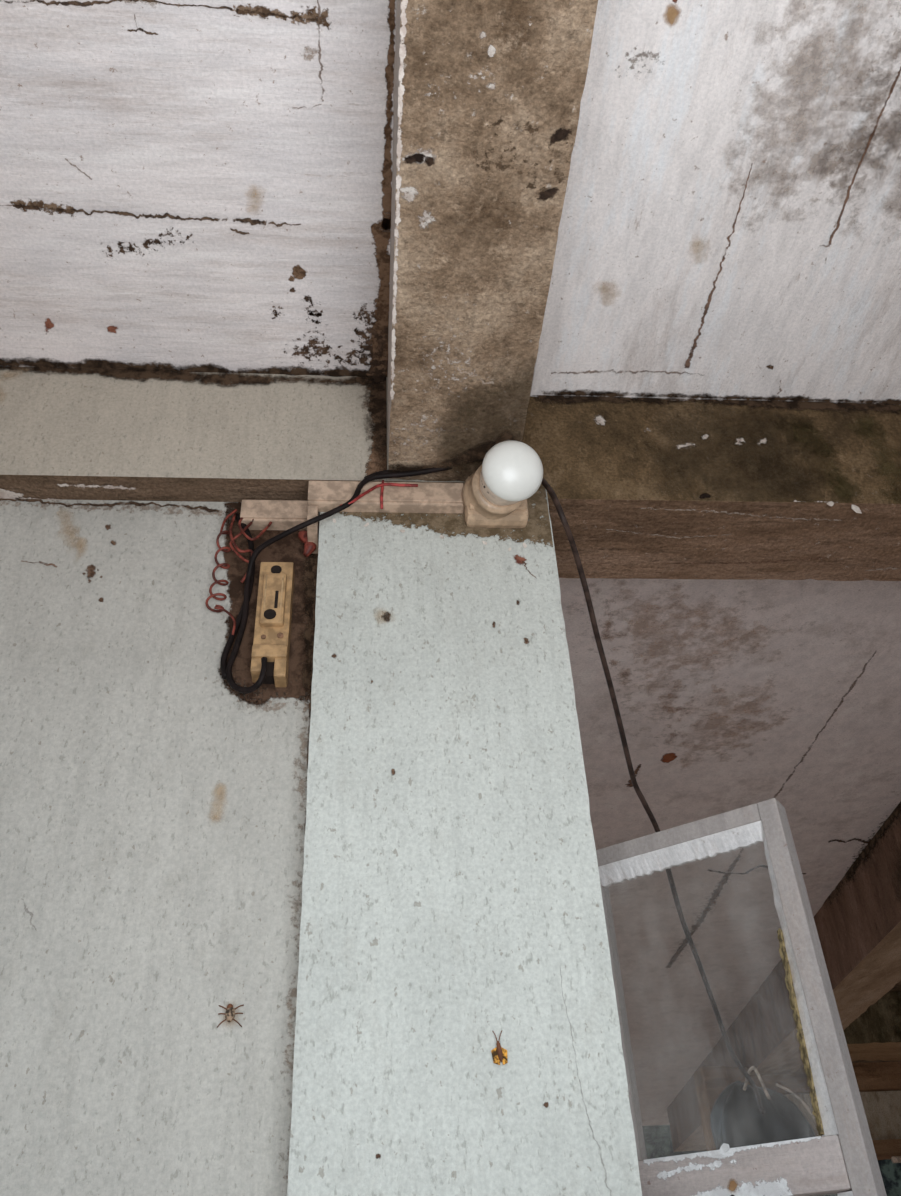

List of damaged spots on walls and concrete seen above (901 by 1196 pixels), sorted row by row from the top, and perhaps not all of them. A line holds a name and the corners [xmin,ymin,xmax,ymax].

crack [5,0,331,109]
damp [615,48,659,72]
crack [822,67,901,261]
crack [2,199,301,235]
peeling [289,265,306,281]
crack [551,163,753,376]
crack [775,652,876,797]
crack [829,836,870,844]
crack [666,849,768,968]
peeling [643,1136,821,1180]
peeling [691,1177,793,1196]